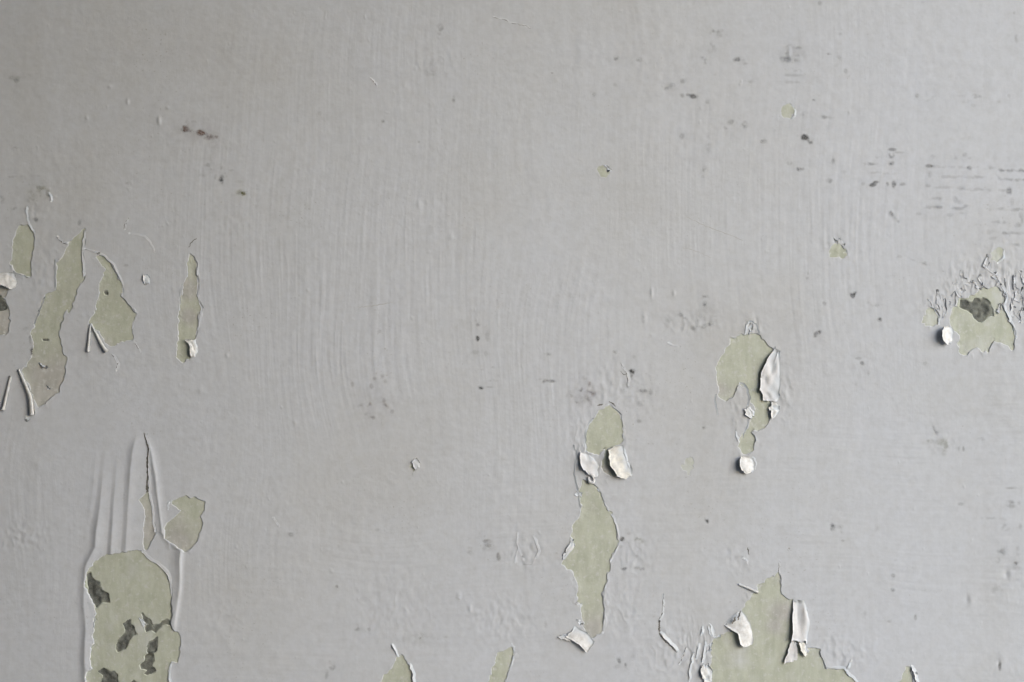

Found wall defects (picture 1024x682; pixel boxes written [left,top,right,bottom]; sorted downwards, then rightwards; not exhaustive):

peeling [0,205,36,335]
peeling [1,228,138,422]
peeling [176,254,203,363]
peeling [922,247,1024,355]
peeling [714,320,781,474]
peeling [85,492,205,682]
peeling [381,643,416,682]
peeling [488,643,515,682]
peeling [558,404,633,653]
peeling [688,560,859,682]